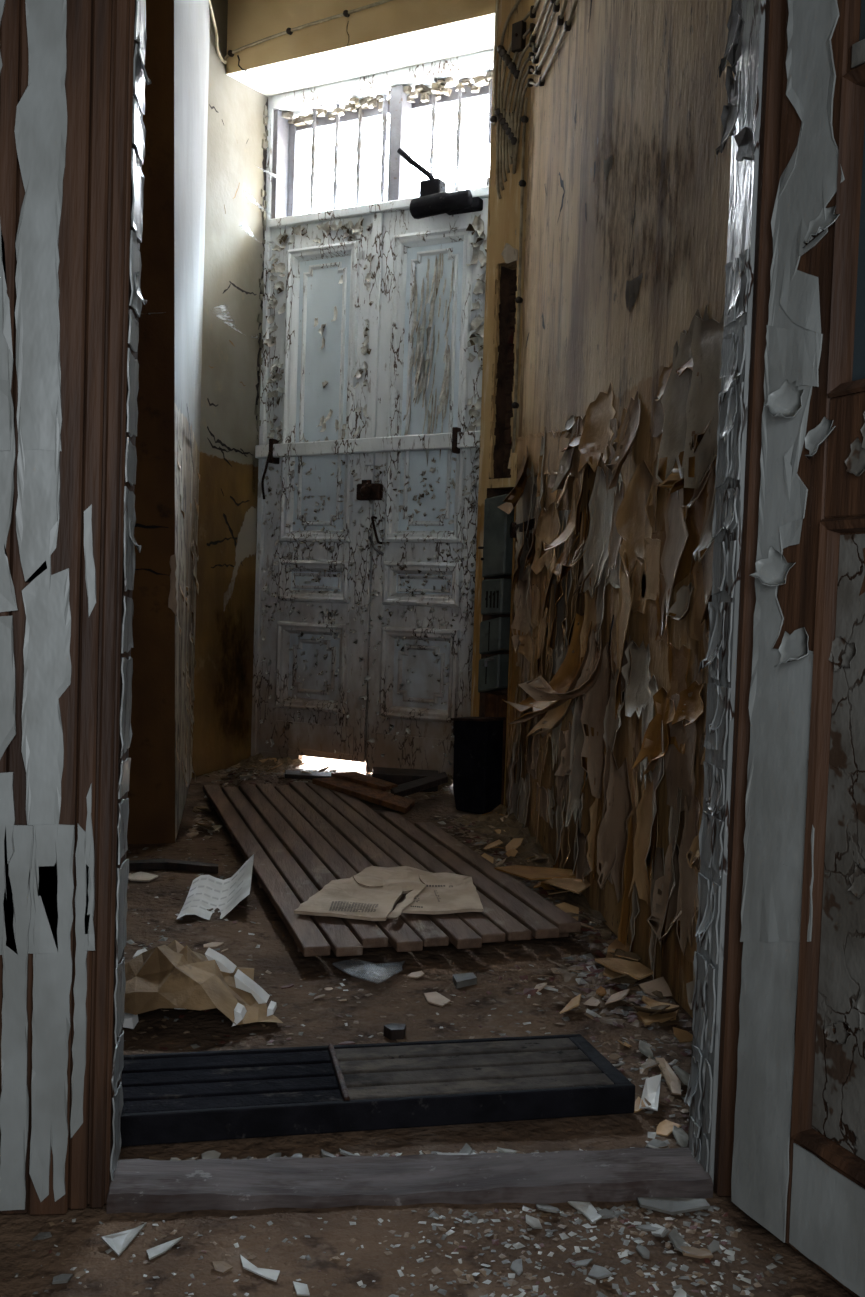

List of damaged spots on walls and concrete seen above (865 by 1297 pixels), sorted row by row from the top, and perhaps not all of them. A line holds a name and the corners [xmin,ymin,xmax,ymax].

water stain [596,115,694,294]
peeling [764,379,805,418]
peeling [805,416,836,460]
peeling [0,0,96,1211]
peeling [110,0,151,1181]
peeling [168,495,199,788]
peeling [224,189,795,1172]
peeling [774,627,809,667]
peeling [149,1150,221,1161]